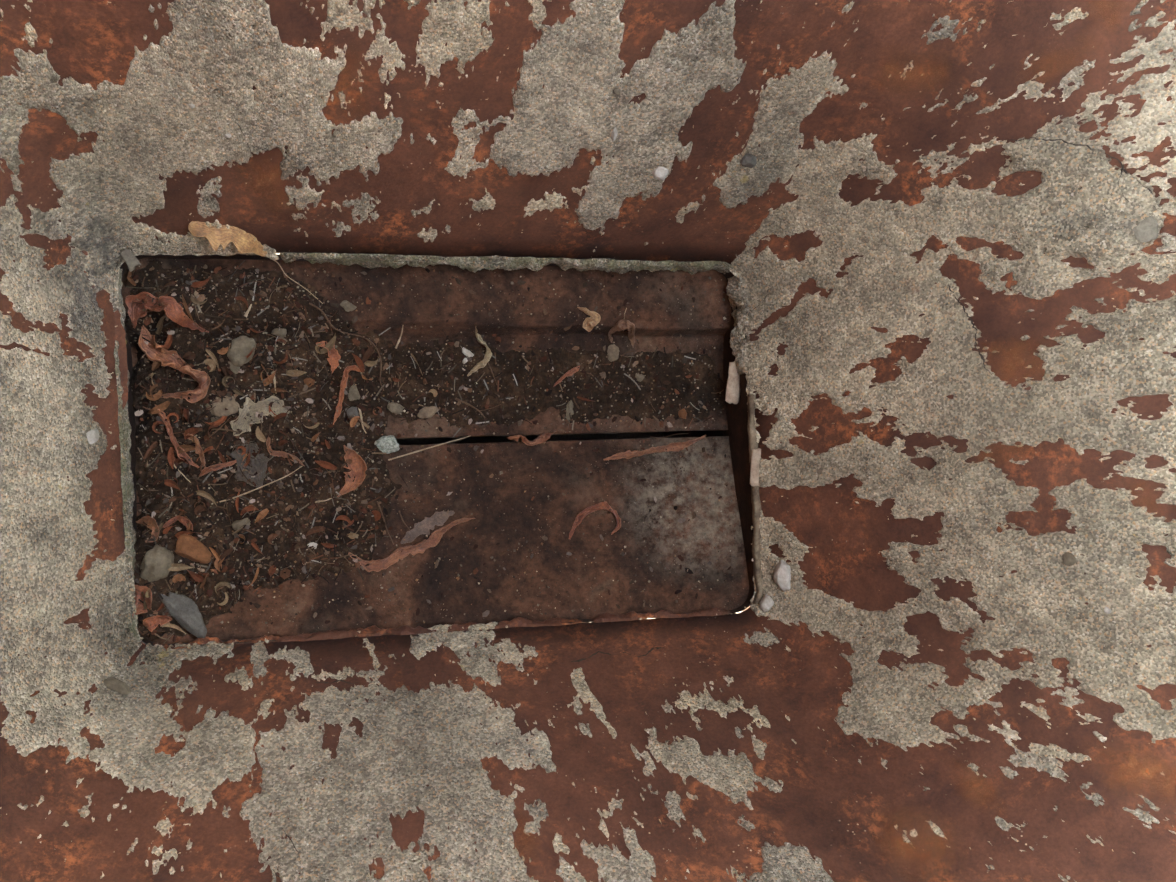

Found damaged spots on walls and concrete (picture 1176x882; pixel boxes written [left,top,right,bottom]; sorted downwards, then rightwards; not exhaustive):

peeling [903,0,1176,216]
peeling [270,169,352,249]
peeling [411,199,451,242]
peeling [460,188,496,225]
corrosion [910,235,1176,382]
corrosion [789,393,1176,536]
peeling [355,631,405,688]
corrosion [80,727,105,751]
peeling [943,700,1092,767]
peeling [1020,686,1107,748]
peeling [552,833,570,856]
peeling [1123,794,1176,834]